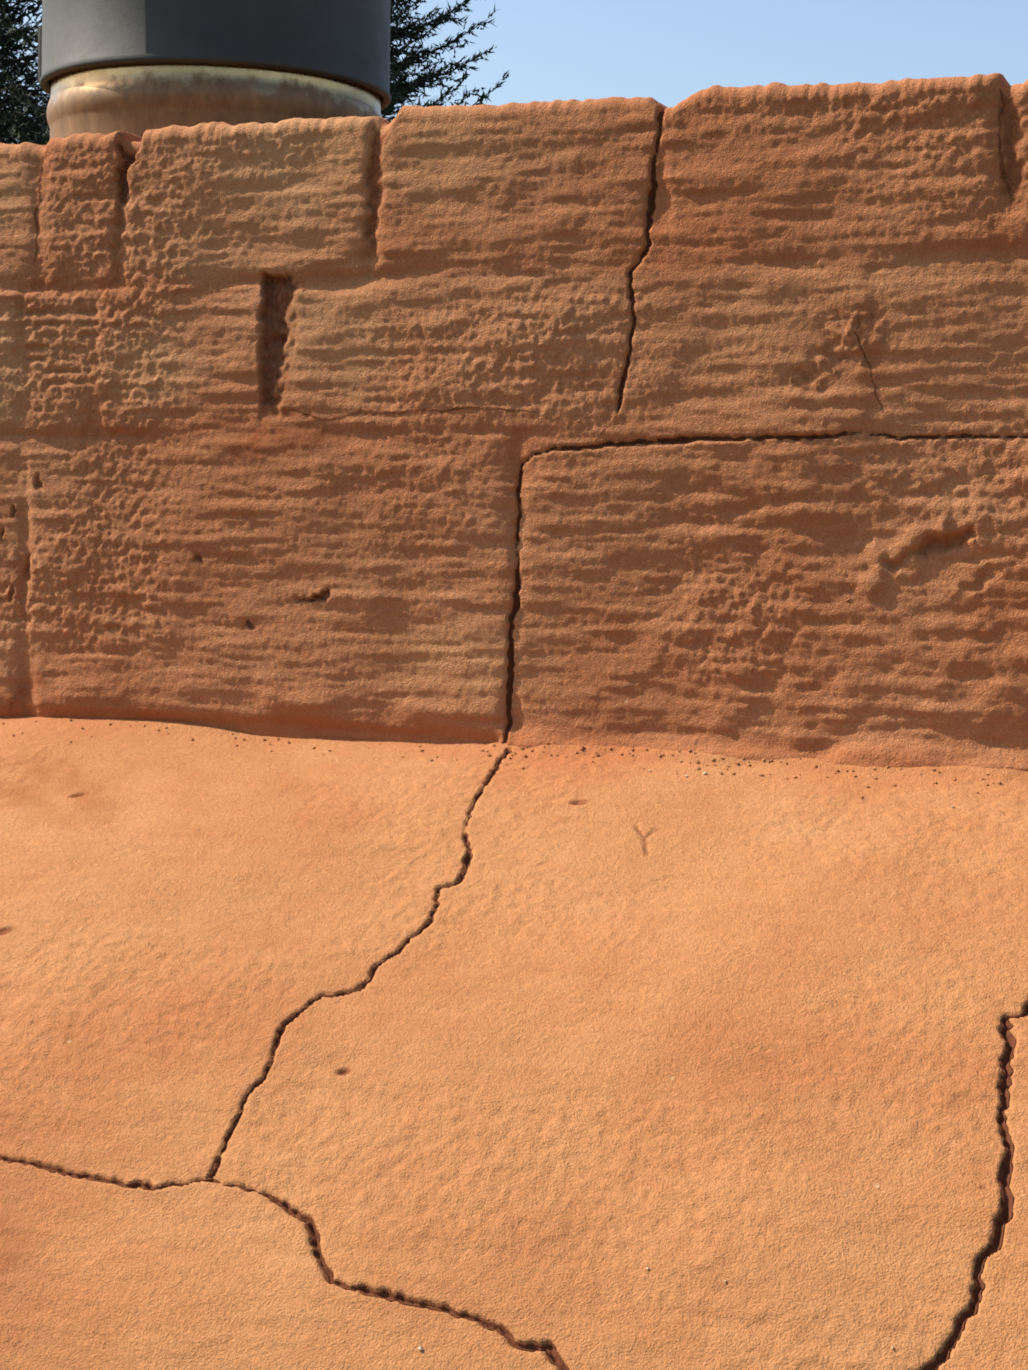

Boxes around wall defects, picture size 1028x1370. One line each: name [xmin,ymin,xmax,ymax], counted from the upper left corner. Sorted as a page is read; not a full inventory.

crack [998,89,1014,211]
crack [870,432,1028,440]
crack [0,111,861,1370]
crack [922,1005,1028,1370]